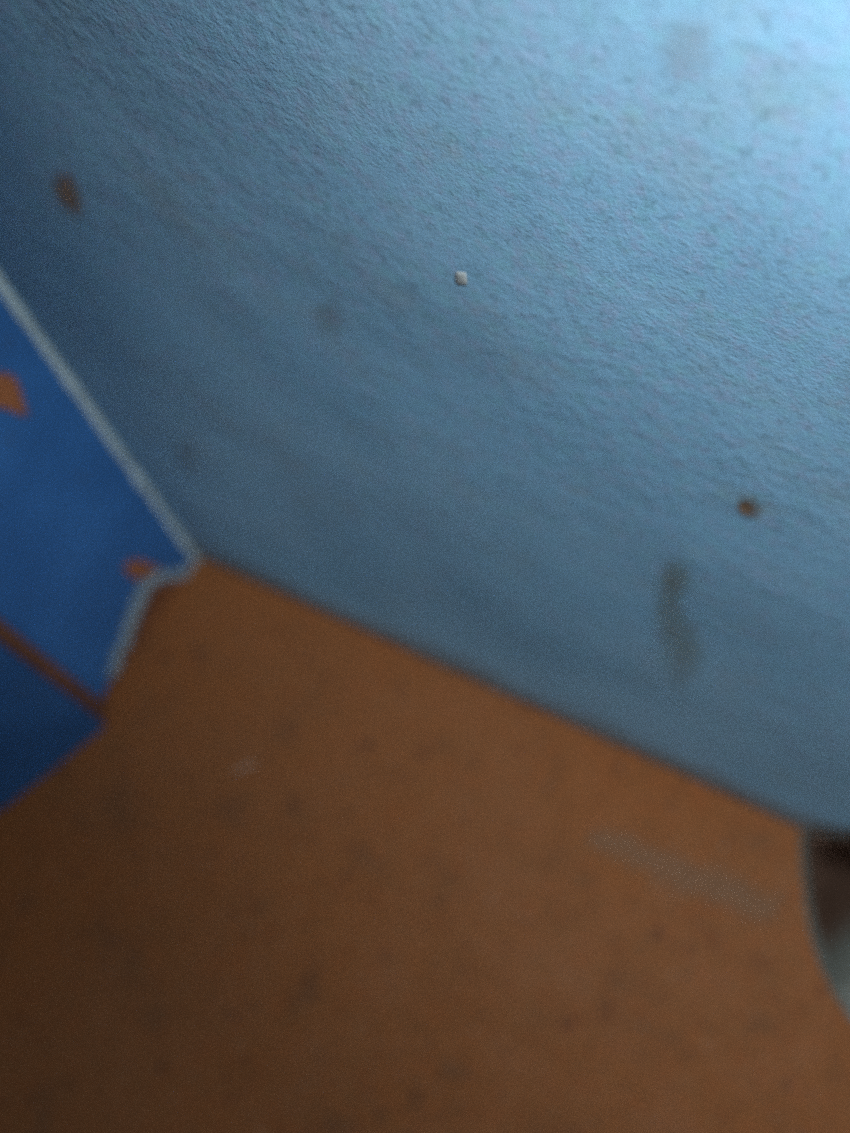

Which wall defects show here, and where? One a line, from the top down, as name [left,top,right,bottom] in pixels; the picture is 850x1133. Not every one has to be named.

spalling [799,826,850,1019]